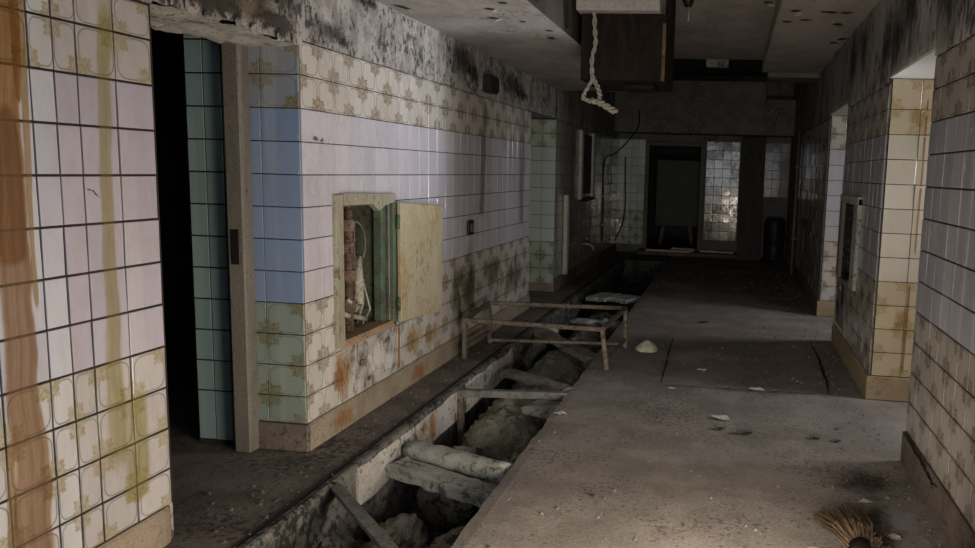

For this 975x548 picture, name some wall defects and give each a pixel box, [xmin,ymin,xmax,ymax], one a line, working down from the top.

crack [660,338,829,395]